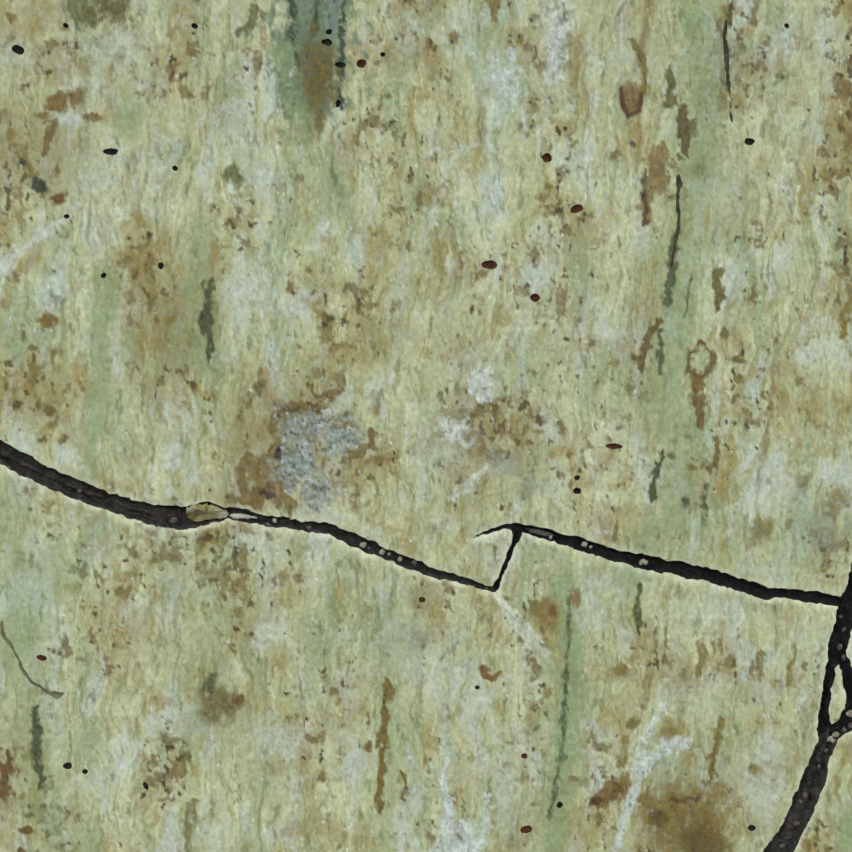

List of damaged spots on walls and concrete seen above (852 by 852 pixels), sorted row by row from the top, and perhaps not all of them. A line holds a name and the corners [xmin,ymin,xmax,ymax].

leakage [264,0,312,152]
leakage [311,0,348,116]
rust [615,35,651,125]
spalling [266,391,375,522]
crack [0,440,852,852]